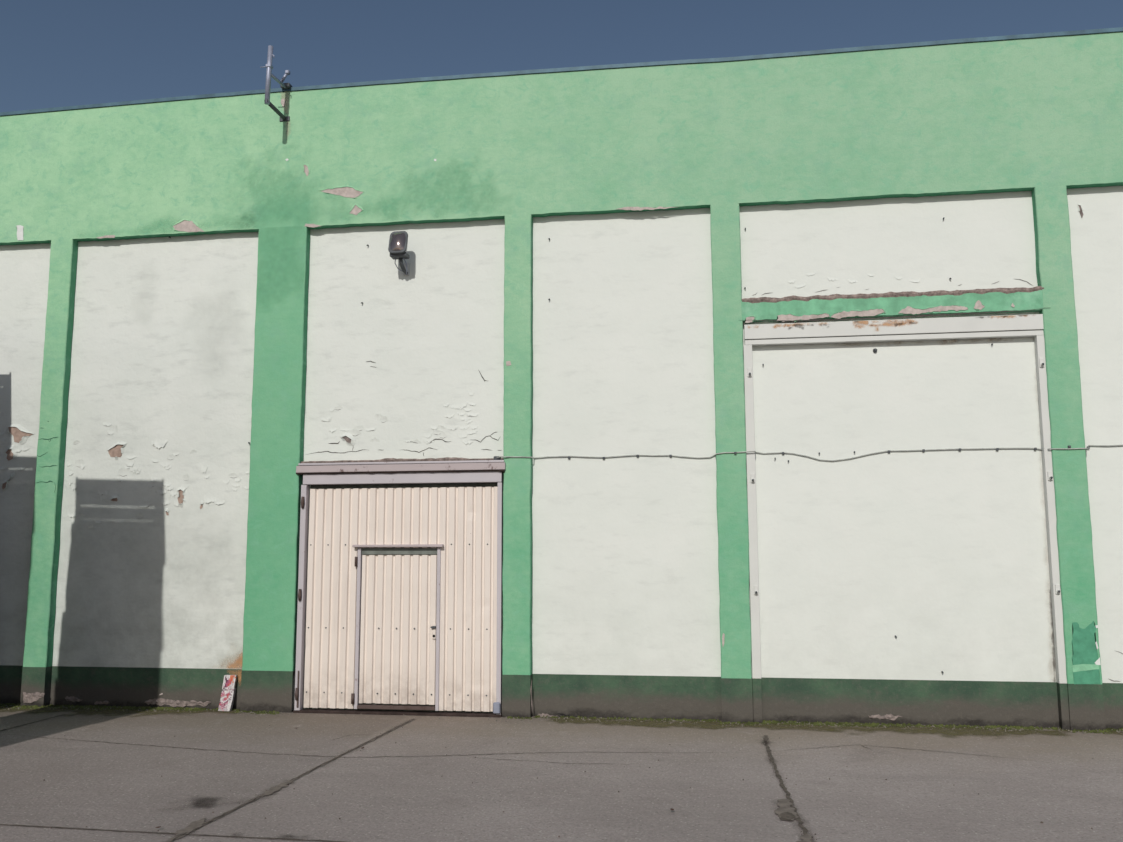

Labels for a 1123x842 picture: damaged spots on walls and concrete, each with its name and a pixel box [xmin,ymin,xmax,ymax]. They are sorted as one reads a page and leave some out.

peeling [320,185,364,215]
peeling [173,219,205,232]
spalling [742,286,1044,323]
peeling [1,424,34,492]
peeling [107,442,127,460]
peeling [340,432,356,446]
peeling [164,486,186,515]
peeling [1072,621,1101,684]